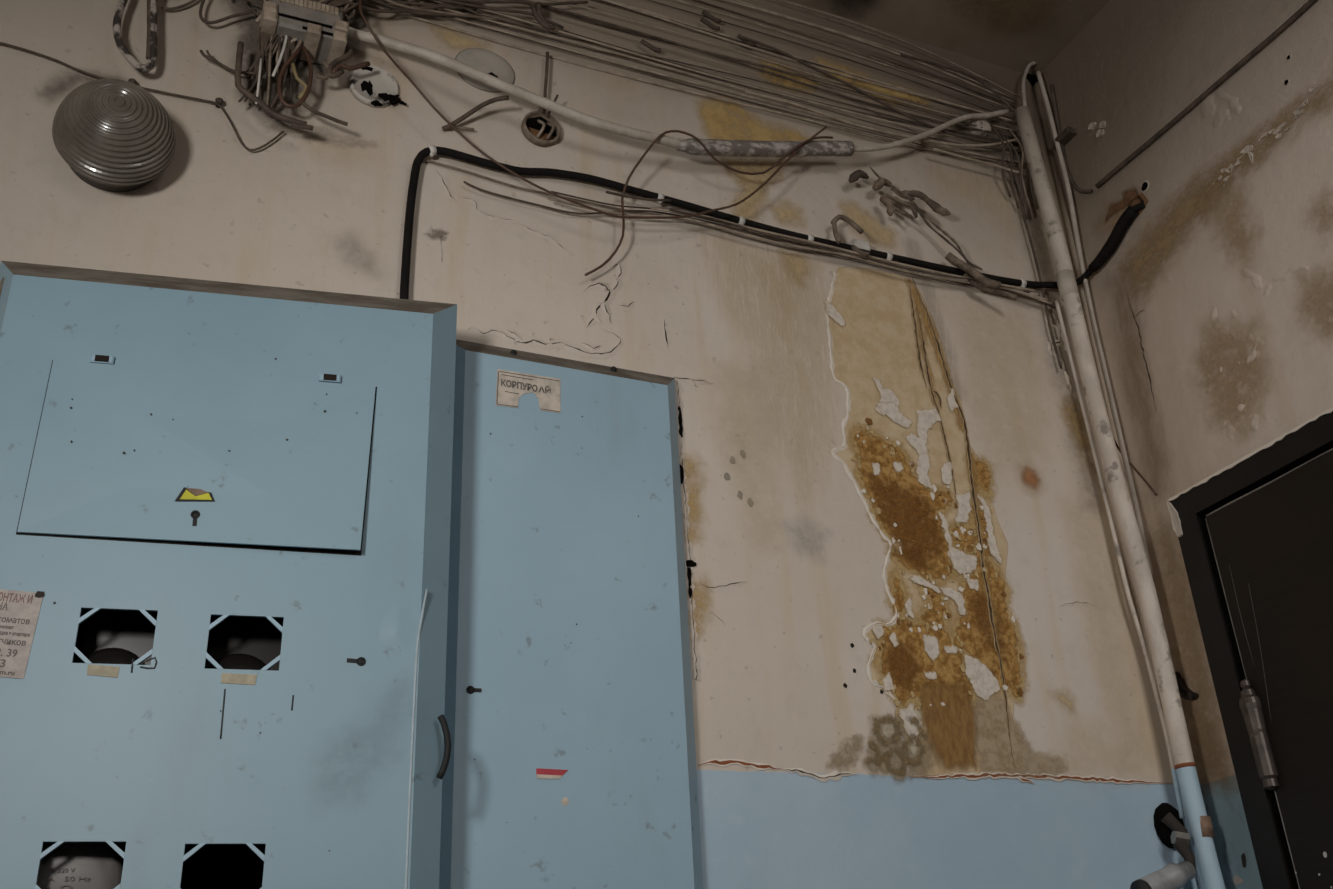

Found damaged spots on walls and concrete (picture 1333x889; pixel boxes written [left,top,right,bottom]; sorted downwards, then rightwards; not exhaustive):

water stain [700,100,807,141]
crack [436,170,574,255]
water stain [730,161,797,221]
water stain [1128,94,1327,293]
crack [467,261,635,359]
crack [662,319,714,388]
corrosion [1022,469,1038,487]
peeling [824,267,1026,776]
mould [830,710,931,780]
water stain [975,698,1064,776]